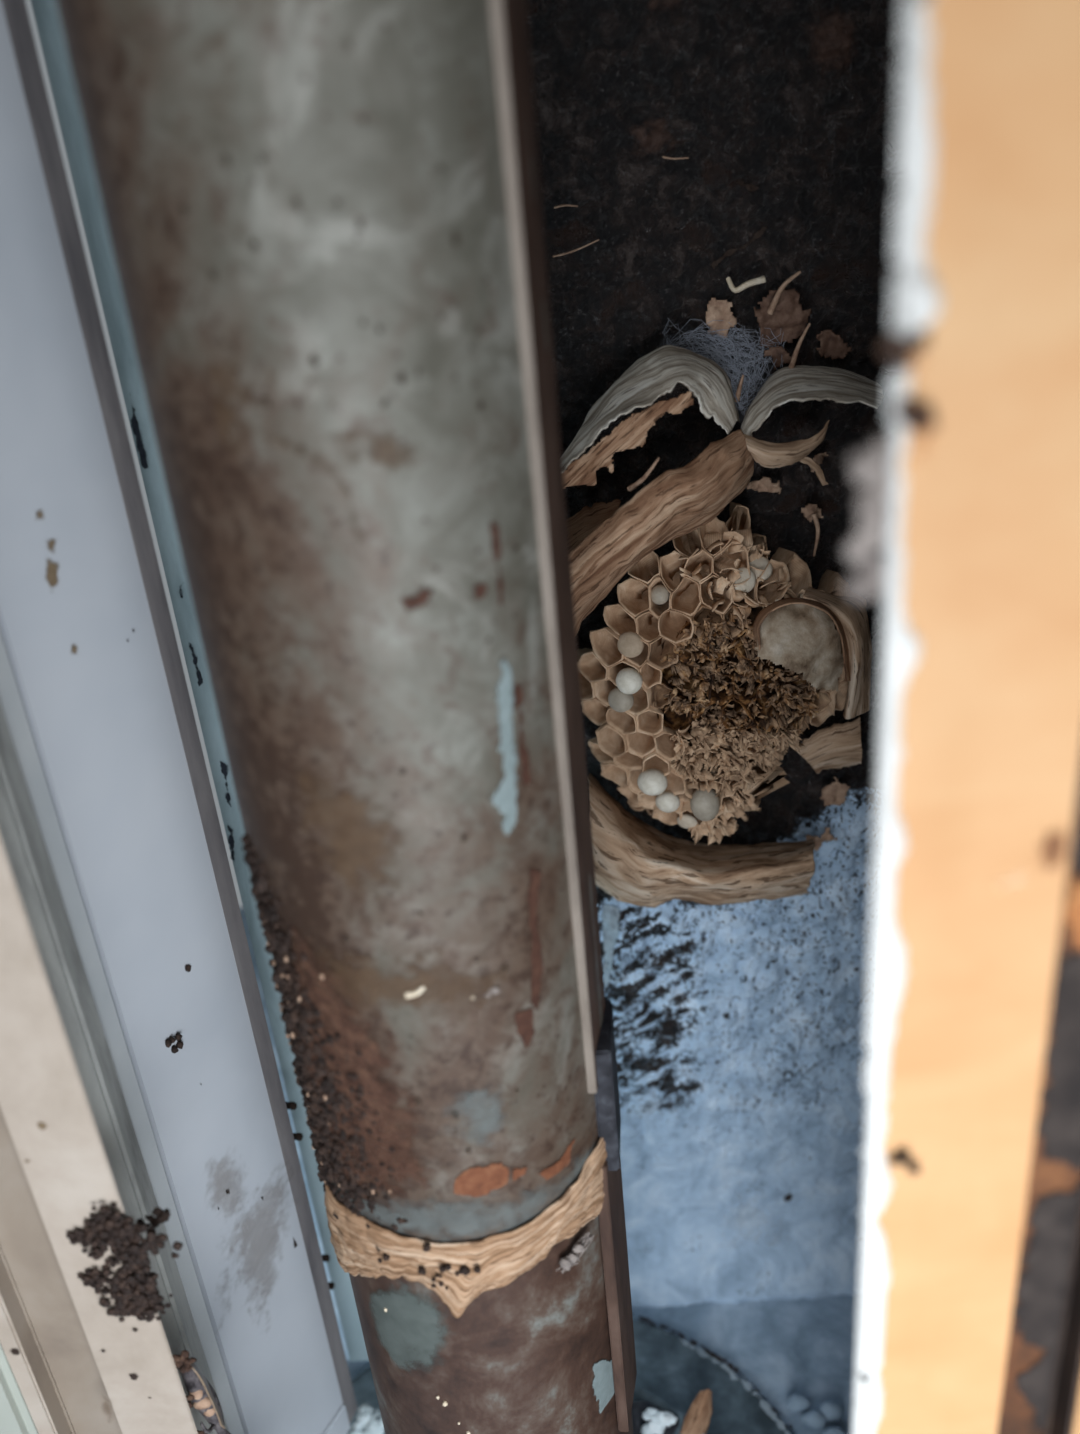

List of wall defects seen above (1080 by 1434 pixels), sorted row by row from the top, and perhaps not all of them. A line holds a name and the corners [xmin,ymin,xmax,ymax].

corrosion [372,438,408,467]
corrosion [402,586,433,611]
corrosion [474,521,503,605]
peeling [492,660,517,835]
corrosion [513,684,531,785]
corrosion [515,868,543,1051]
corrosion [453,1139,575,1198]